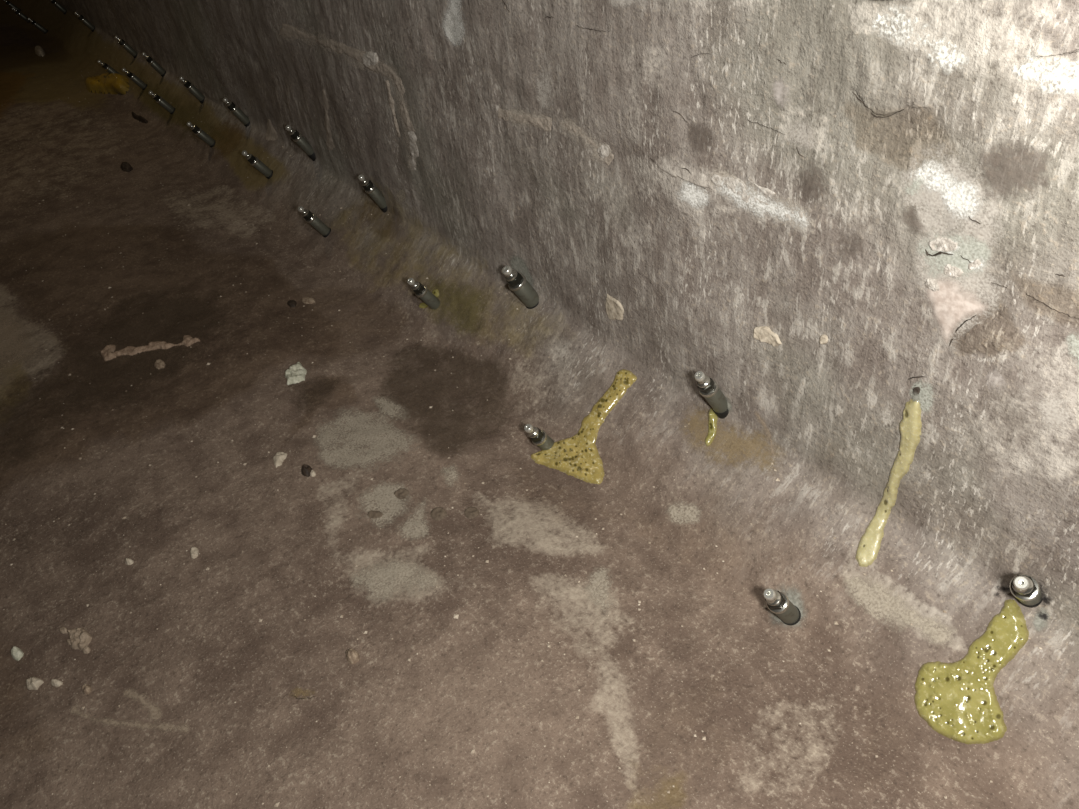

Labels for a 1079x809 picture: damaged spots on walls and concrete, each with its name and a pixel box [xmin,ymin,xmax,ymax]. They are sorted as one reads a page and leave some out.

leakage [872,8,968,71]
leakage [1013,56,1079,94]
crack [925,249,971,263]
crack [991,282,1079,319]
leakage [317,348,503,468]